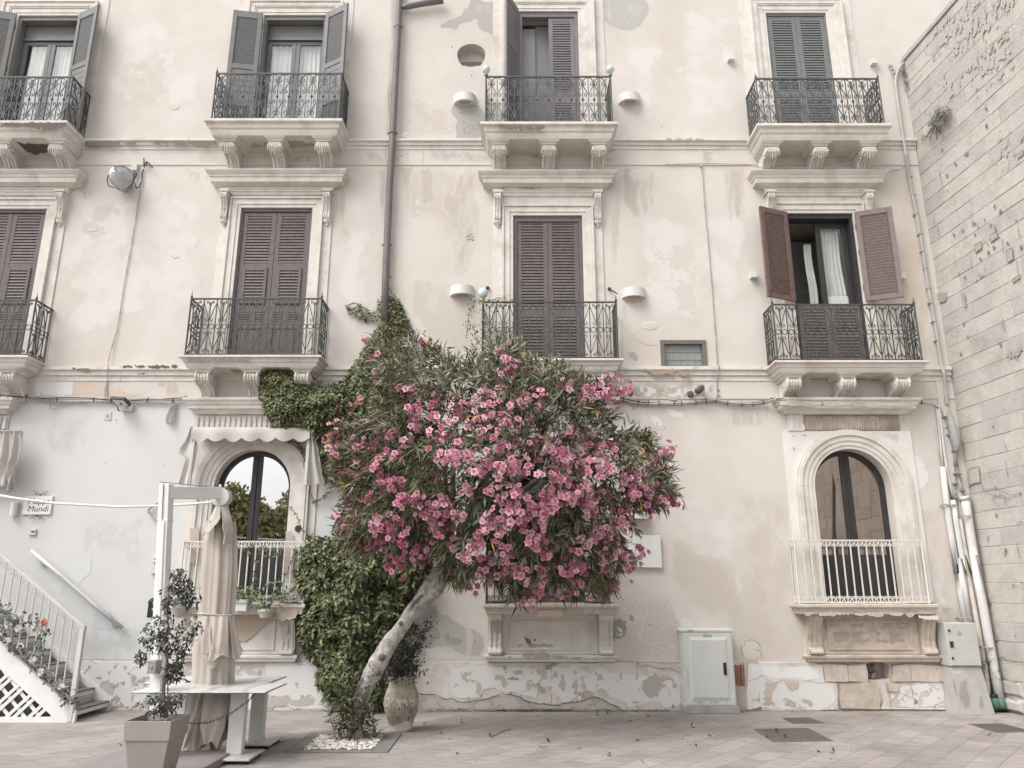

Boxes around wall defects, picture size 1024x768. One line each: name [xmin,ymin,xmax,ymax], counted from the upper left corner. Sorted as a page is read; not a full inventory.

peeling [440,0,493,35]
peeling [72,661,150,709]
spalling [387,665,677,721]
peeling [764,682,799,699]